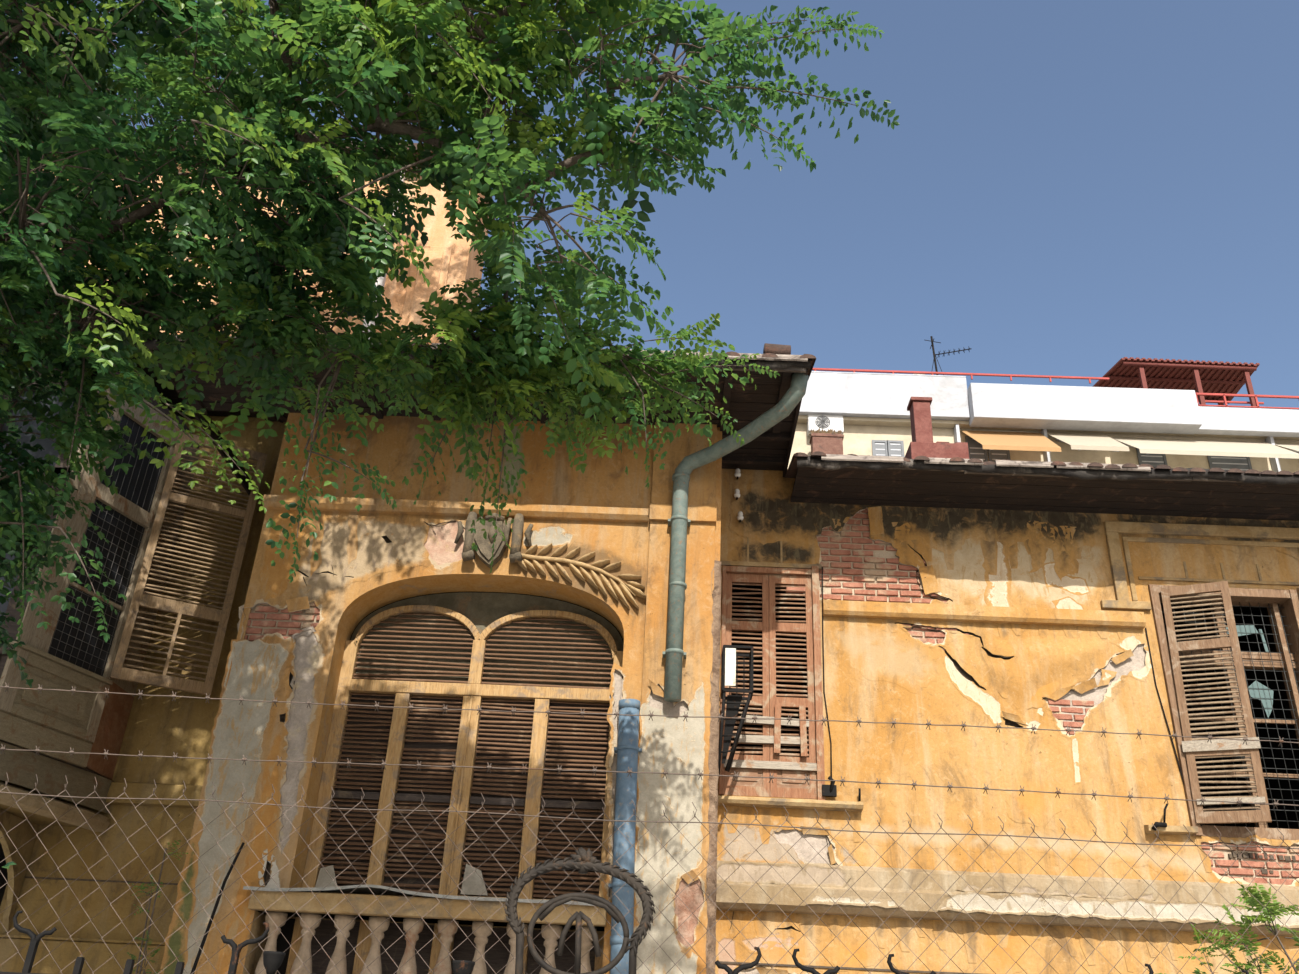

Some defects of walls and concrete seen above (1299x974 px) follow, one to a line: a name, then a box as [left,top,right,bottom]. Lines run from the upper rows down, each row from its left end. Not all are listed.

peeling [522,524,575,549]
flaking render [786,506,1112,610]
crack [895,546,1011,690]
leakage [724,482,1299,582]
peeling [180,516,465,974]
peeling [601,560,1299,974]